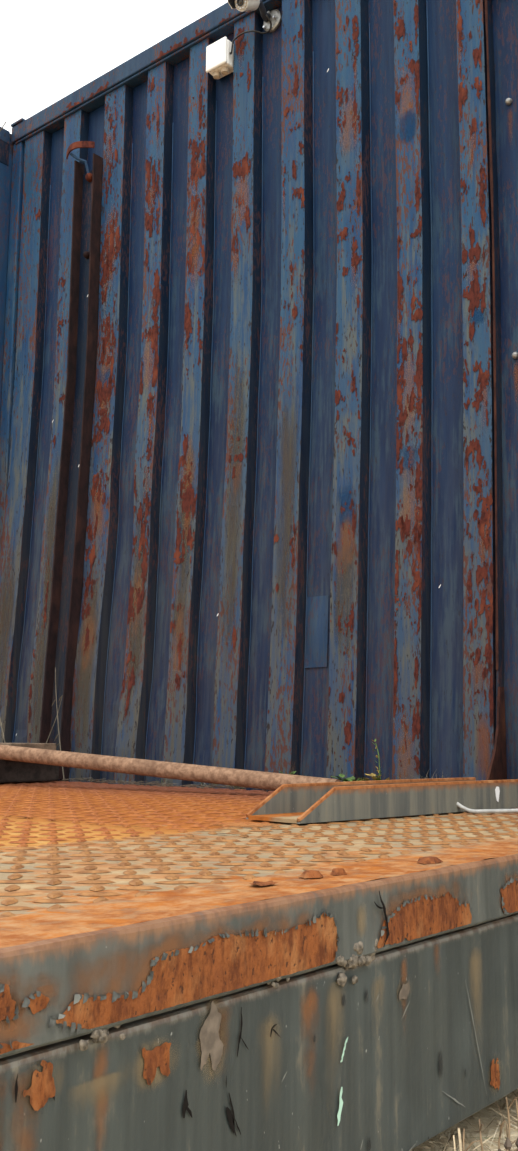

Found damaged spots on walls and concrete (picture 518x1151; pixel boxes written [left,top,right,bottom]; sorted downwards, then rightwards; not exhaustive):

corrosion [63,81,122,449]
corrosion [186,73,206,276]
corrosion [79,469,108,656]
corrosion [127,156,162,625]
corrosion [174,434,197,572]
corrosion [219,0,518,827]
corrosion [121,651,139,716]
corrosion [299,868,347,878]